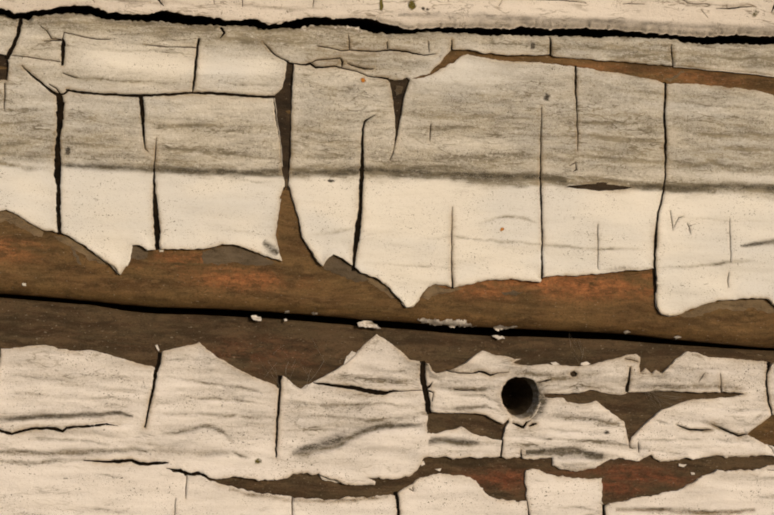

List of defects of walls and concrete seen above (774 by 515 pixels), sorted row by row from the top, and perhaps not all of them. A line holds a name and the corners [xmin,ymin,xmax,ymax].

crack [263,37,452,80]
crack [5,18,275,250]
crack [351,115,375,271]
peeling [0,13,774,348]
crack [537,129,545,279]
crack [652,50,690,295]
crack [0,423,118,435]
crack [84,459,206,515]
crack [144,352,162,428]
crack [274,375,282,457]
crack [313,361,433,414]
peeling [0,298,774,515]